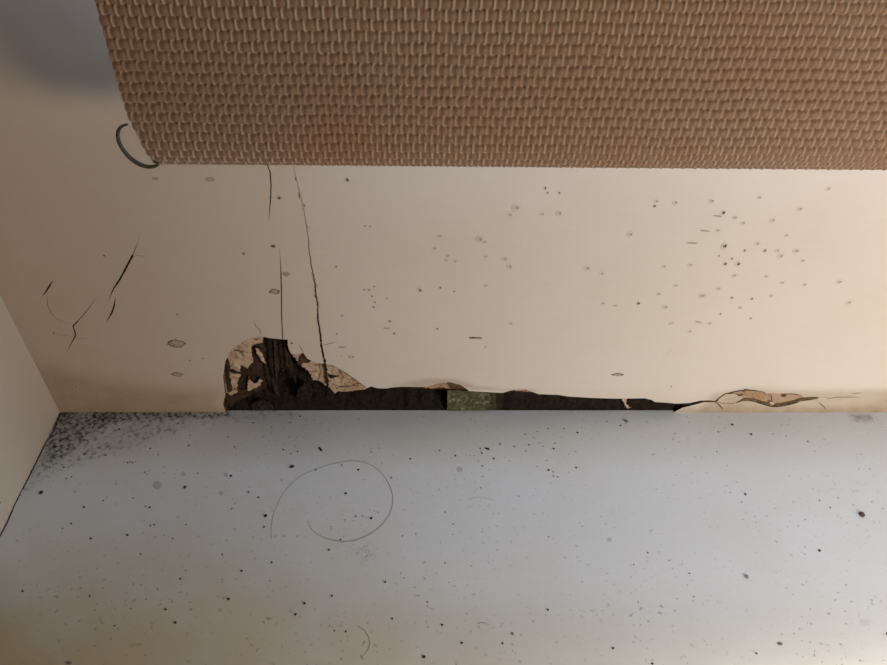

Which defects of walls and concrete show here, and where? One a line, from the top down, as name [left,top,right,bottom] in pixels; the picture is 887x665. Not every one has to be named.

crack [43,235,140,346]
crack [279,173,355,388]
spalling [225,350,476,411]
spalling [489,389,807,410]
leakage [49,409,230,464]